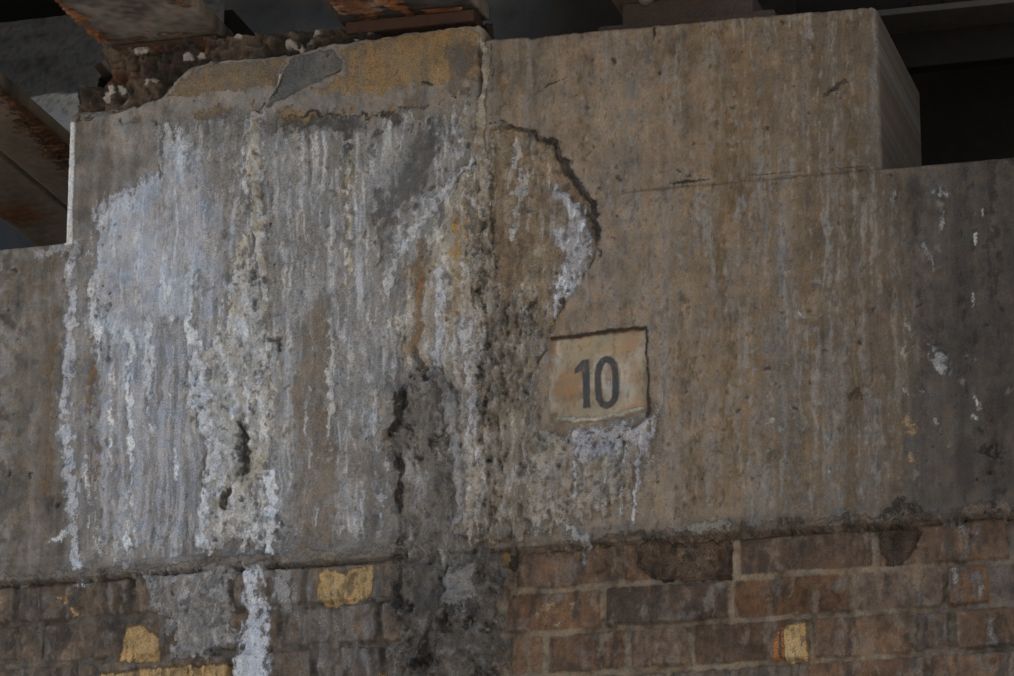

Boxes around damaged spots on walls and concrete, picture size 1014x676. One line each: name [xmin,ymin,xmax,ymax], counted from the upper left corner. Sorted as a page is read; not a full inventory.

corrosion [328,0,465,21]
peeling [260,49,342,110]
corrosion [0,86,70,177]
damp [64,122,75,248]
crack [672,177,707,185]
spalling [488,126,602,377]
damp [71,94,663,598]